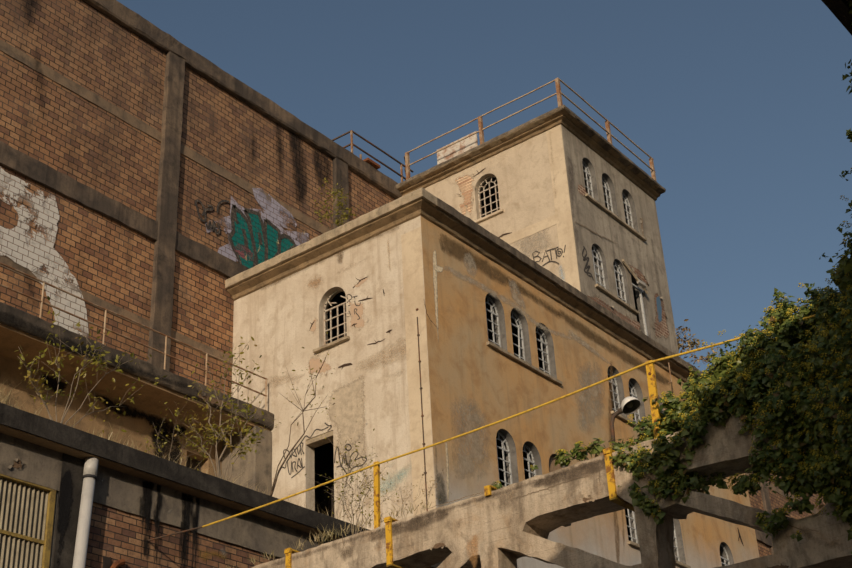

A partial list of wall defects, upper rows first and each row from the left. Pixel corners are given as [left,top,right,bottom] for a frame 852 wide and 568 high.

flaking render [346,298,368,330]
leakage [57,471,73,563]
leakage [139,481,162,563]
leakage [179,494,207,568]